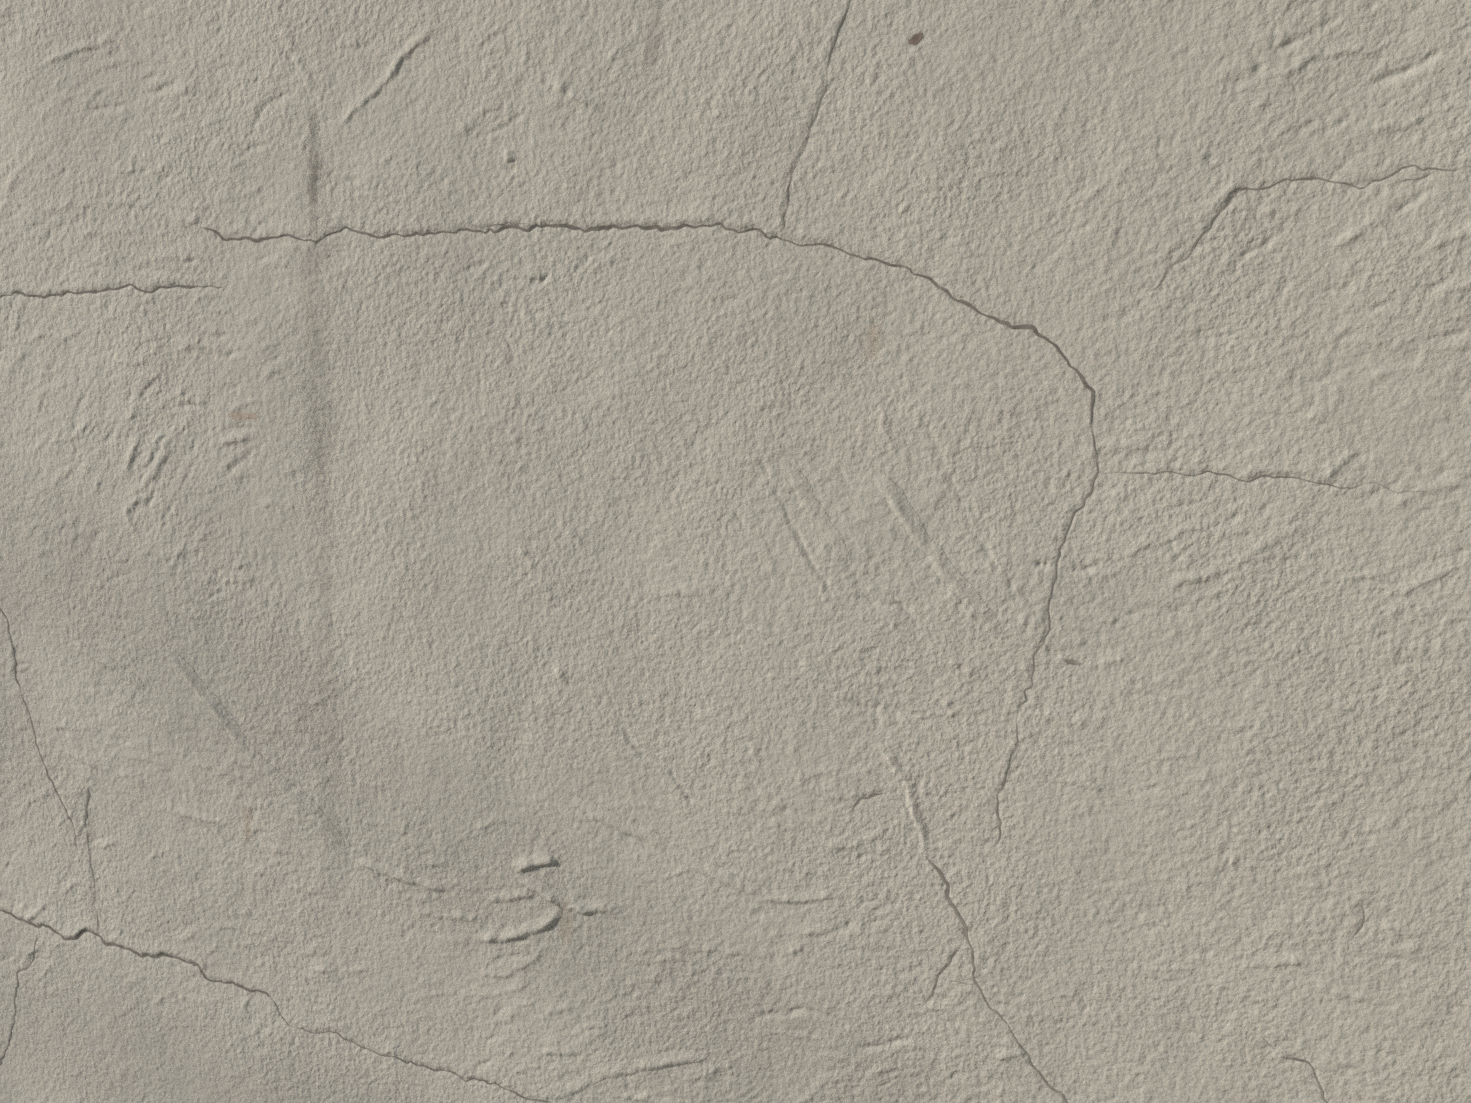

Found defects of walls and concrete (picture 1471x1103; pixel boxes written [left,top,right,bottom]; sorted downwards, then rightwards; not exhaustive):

crack [0,284,220,298]
crack [202,0,1471,847]
crack [0,609,549,1102]
crack [920,857,1067,1103]
crack [1262,1037,1327,1103]